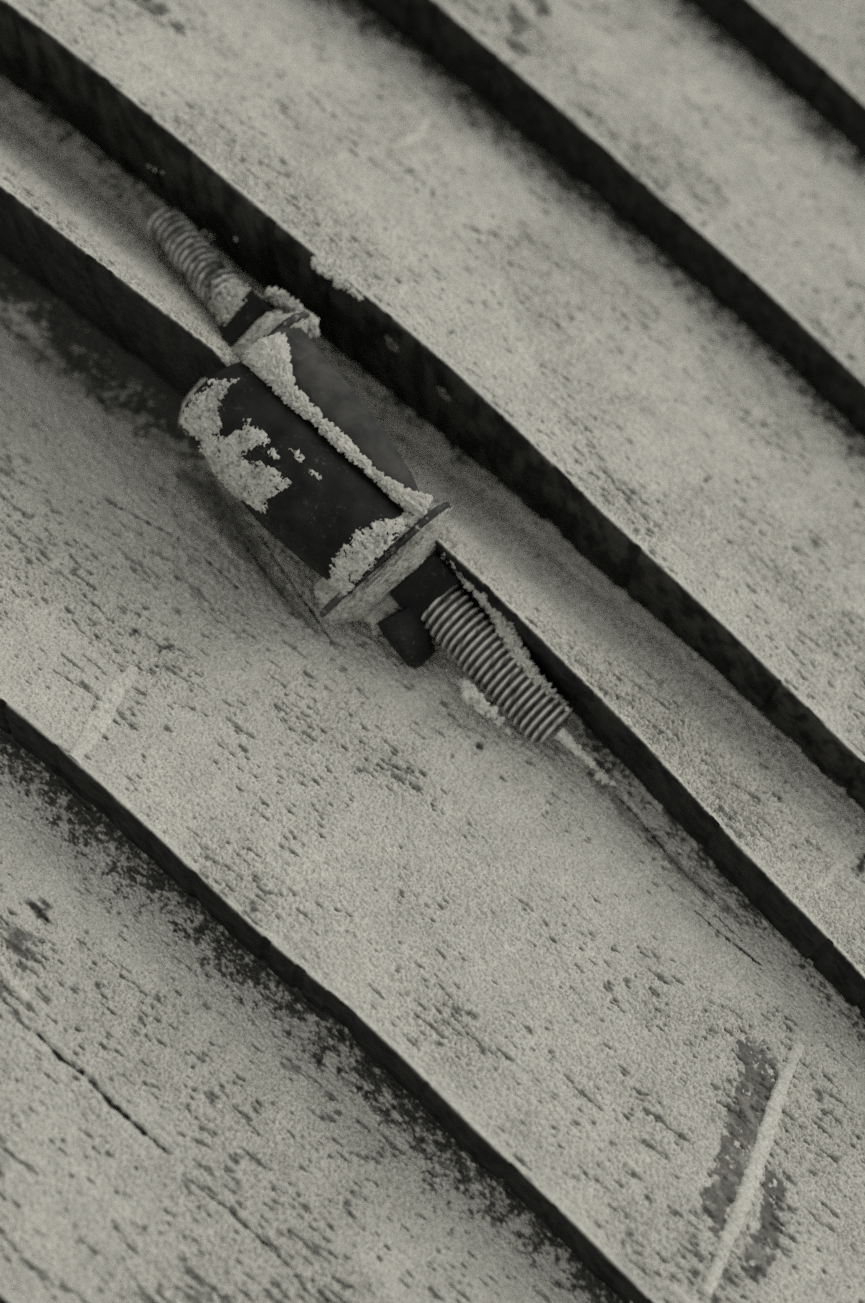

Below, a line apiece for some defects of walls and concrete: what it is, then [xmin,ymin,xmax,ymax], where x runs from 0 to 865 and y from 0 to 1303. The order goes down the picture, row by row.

peeling [180,378,322,514]
peeling [327,515,408,595]